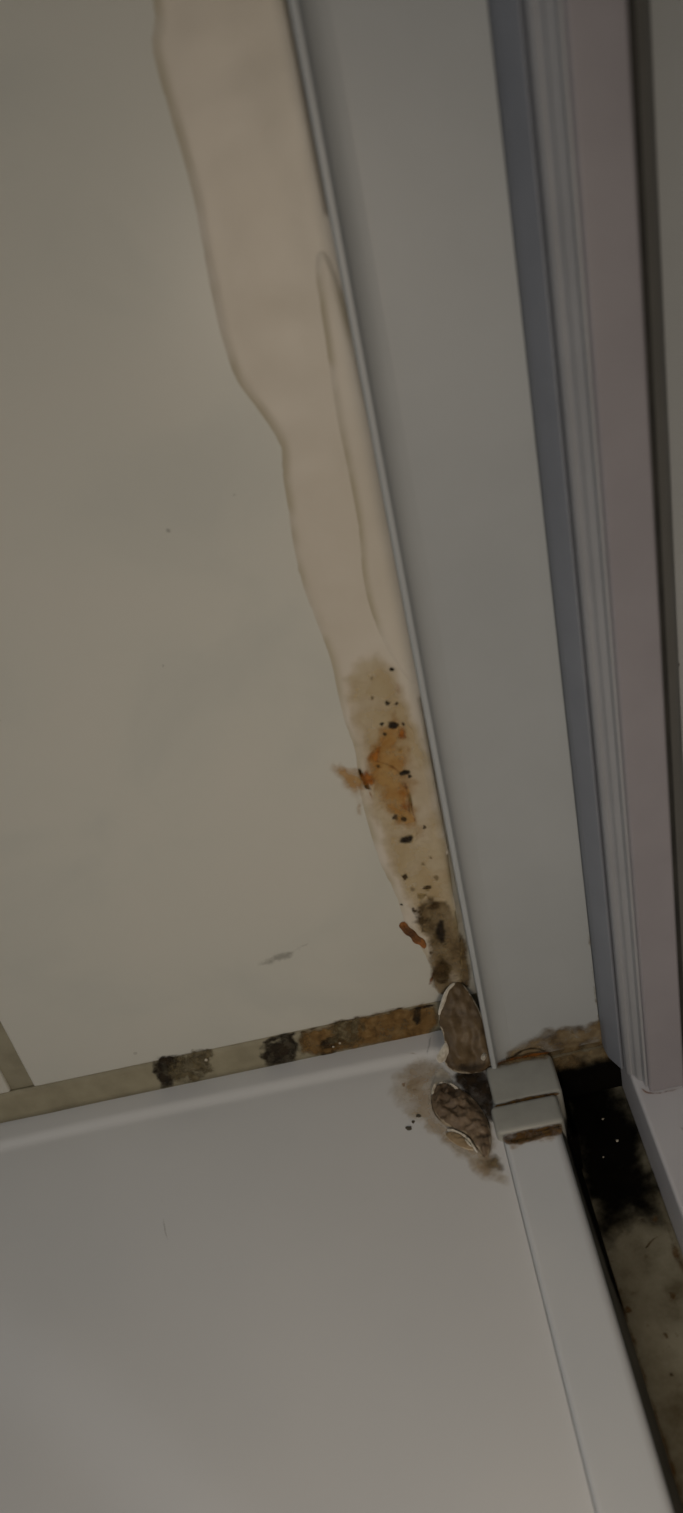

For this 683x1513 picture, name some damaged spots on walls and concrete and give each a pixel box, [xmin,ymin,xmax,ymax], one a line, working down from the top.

rust [362,727,415,825]
damp [260,668,470,1066]
peeling [438,983,455,1015]
damp [153,1049,213,1088]
peeling [436,1043,449,1063]
peeling [446,1129,478,1152]
damp [508,1048,660,1312]